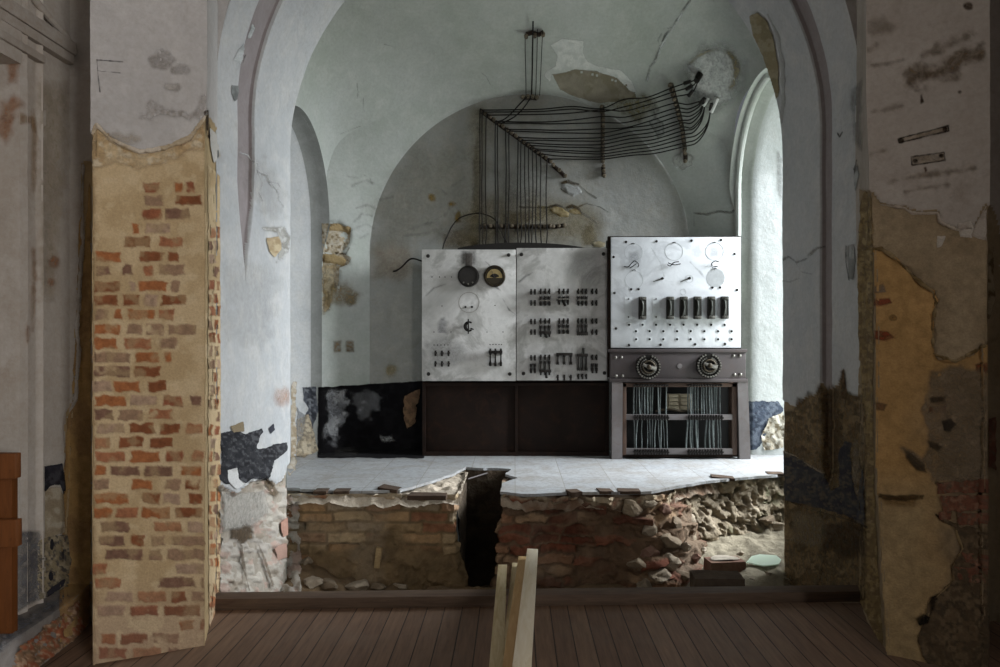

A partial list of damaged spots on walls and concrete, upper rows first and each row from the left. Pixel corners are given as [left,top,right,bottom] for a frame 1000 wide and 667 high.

spalling [545,39,655,121]
spalling [749,13,786,123]
spalling [0,97,790,667]
spalling [749,160,996,663]